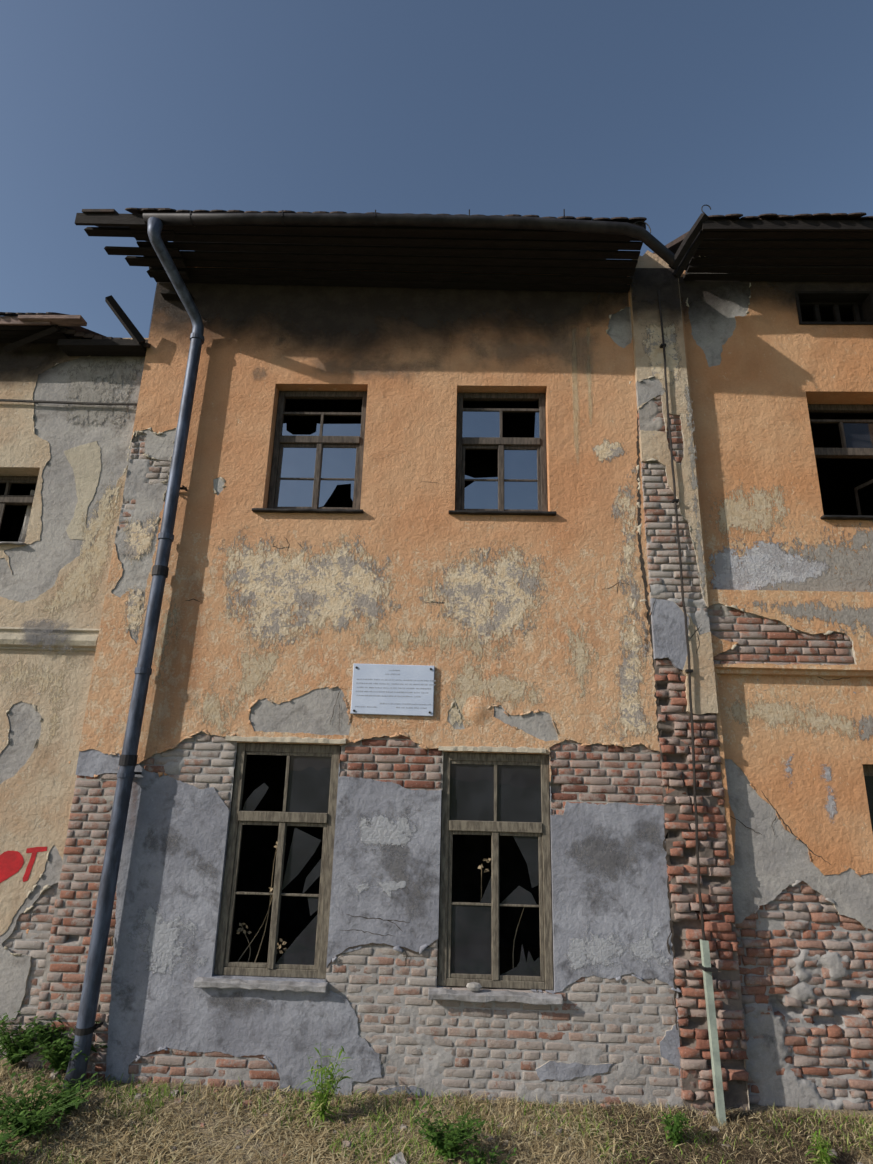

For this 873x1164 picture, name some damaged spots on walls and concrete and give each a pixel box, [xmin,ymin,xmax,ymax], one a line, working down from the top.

spalling [56,328,123,339]
peeling [686,273,751,367]
peeling [0,343,177,644]
peeling [0,701,43,784]
flaking render [128,307,873,1115]